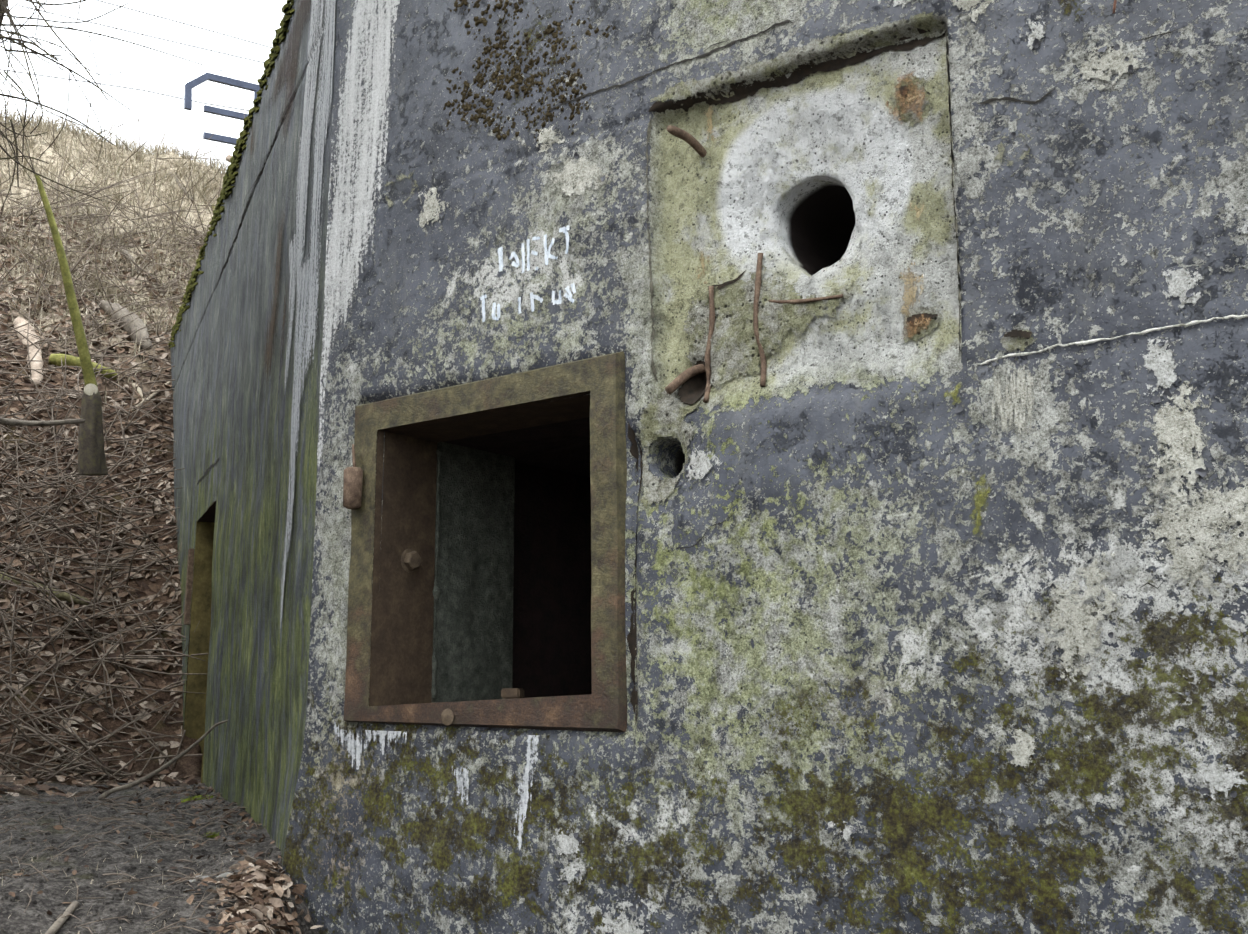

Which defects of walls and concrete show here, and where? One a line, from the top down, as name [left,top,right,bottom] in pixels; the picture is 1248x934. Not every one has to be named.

spalling [638,265,865,508]
crack [546,19,1248,382]
corrosion [886,71,925,123]
corrosion [900,262,931,338]